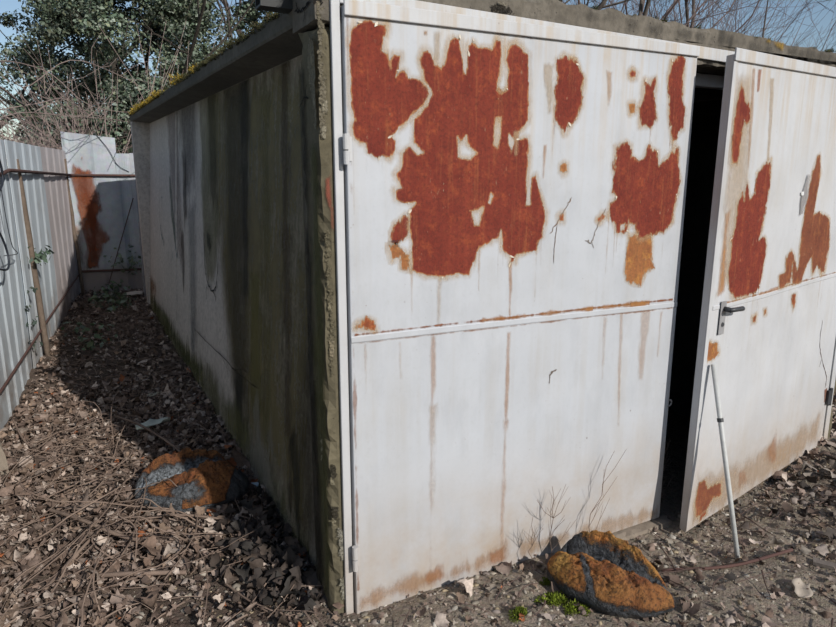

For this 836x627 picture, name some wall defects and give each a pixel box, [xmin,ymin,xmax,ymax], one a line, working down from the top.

rust [72,165,109,268]
damp [169,103,195,313]
rust [349,19,545,278]
rust [597,54,686,287]
rust [731,84,750,166]
rust [719,155,835,307]
damp [285,223,323,583]
rust [695,421,818,522]
rust [399,569,441,591]